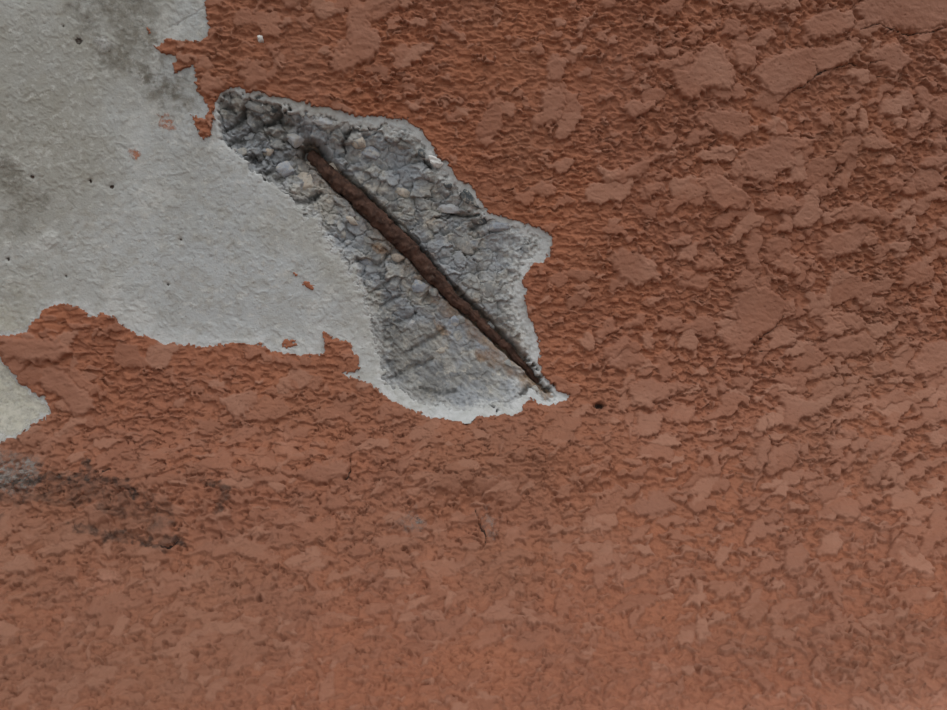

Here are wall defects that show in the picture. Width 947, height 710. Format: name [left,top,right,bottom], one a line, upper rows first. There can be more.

flaking render [0,357,51,443]
flaking render [0,0,569,424]